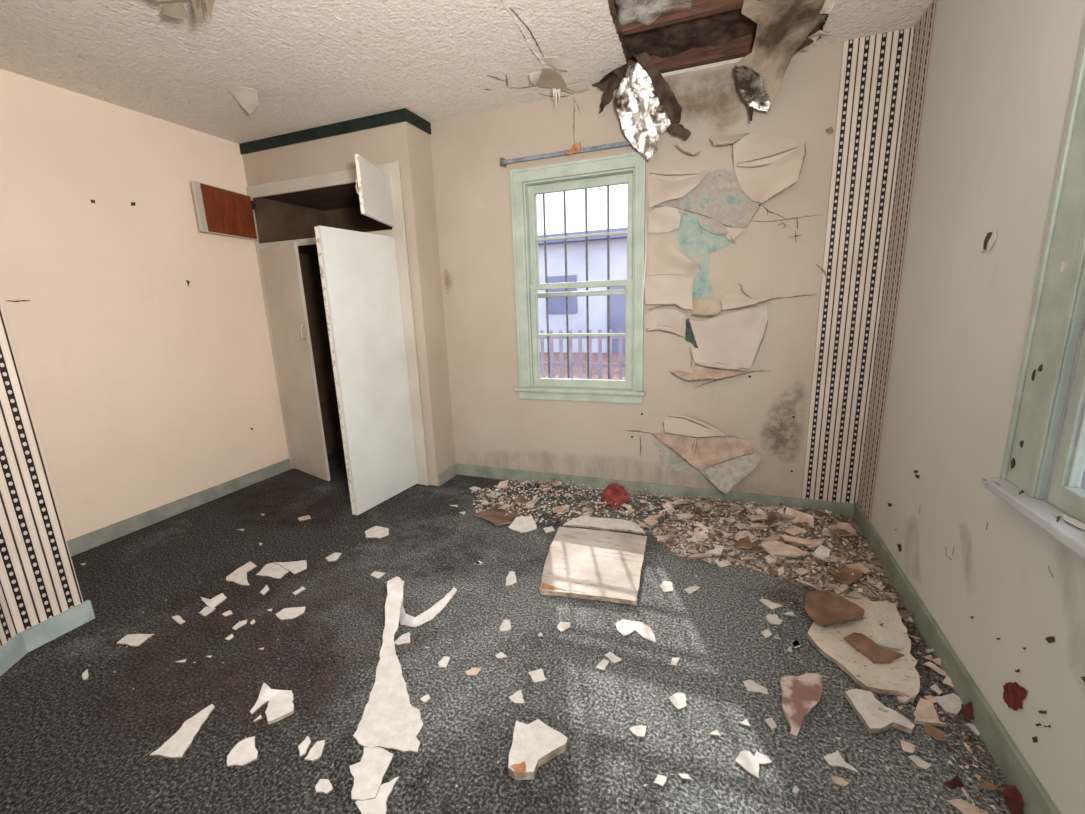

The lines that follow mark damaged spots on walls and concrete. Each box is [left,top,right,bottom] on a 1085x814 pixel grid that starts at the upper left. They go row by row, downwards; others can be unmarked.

peeling [155,0,214,23]
crack [501,0,544,66]
peeling [644,131,815,388]
peeling [624,412,761,494]